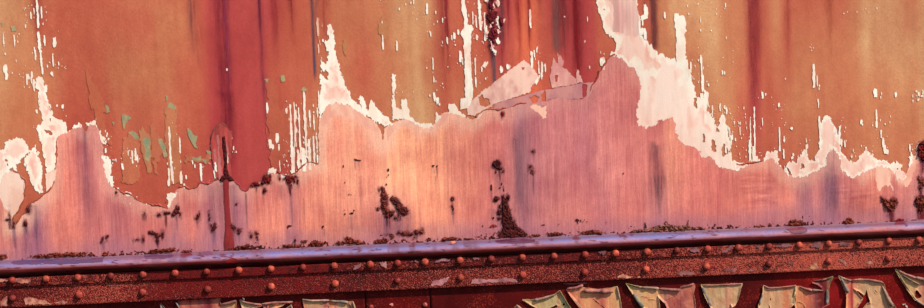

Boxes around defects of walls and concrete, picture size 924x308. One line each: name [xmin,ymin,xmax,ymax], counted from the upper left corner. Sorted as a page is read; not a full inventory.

rust [484,0,530,55]
peeling [0,0,225,260]
peeling [229,0,924,250]
rust [5,205,31,232]
rust [251,174,299,194]
rust [282,168,457,248]
rust [482,159,563,238]
rust [880,196,904,222]
rust [915,140,924,219]
peeling [24,297,67,305]
peeling [514,268,756,308]
peeling [758,259,924,308]